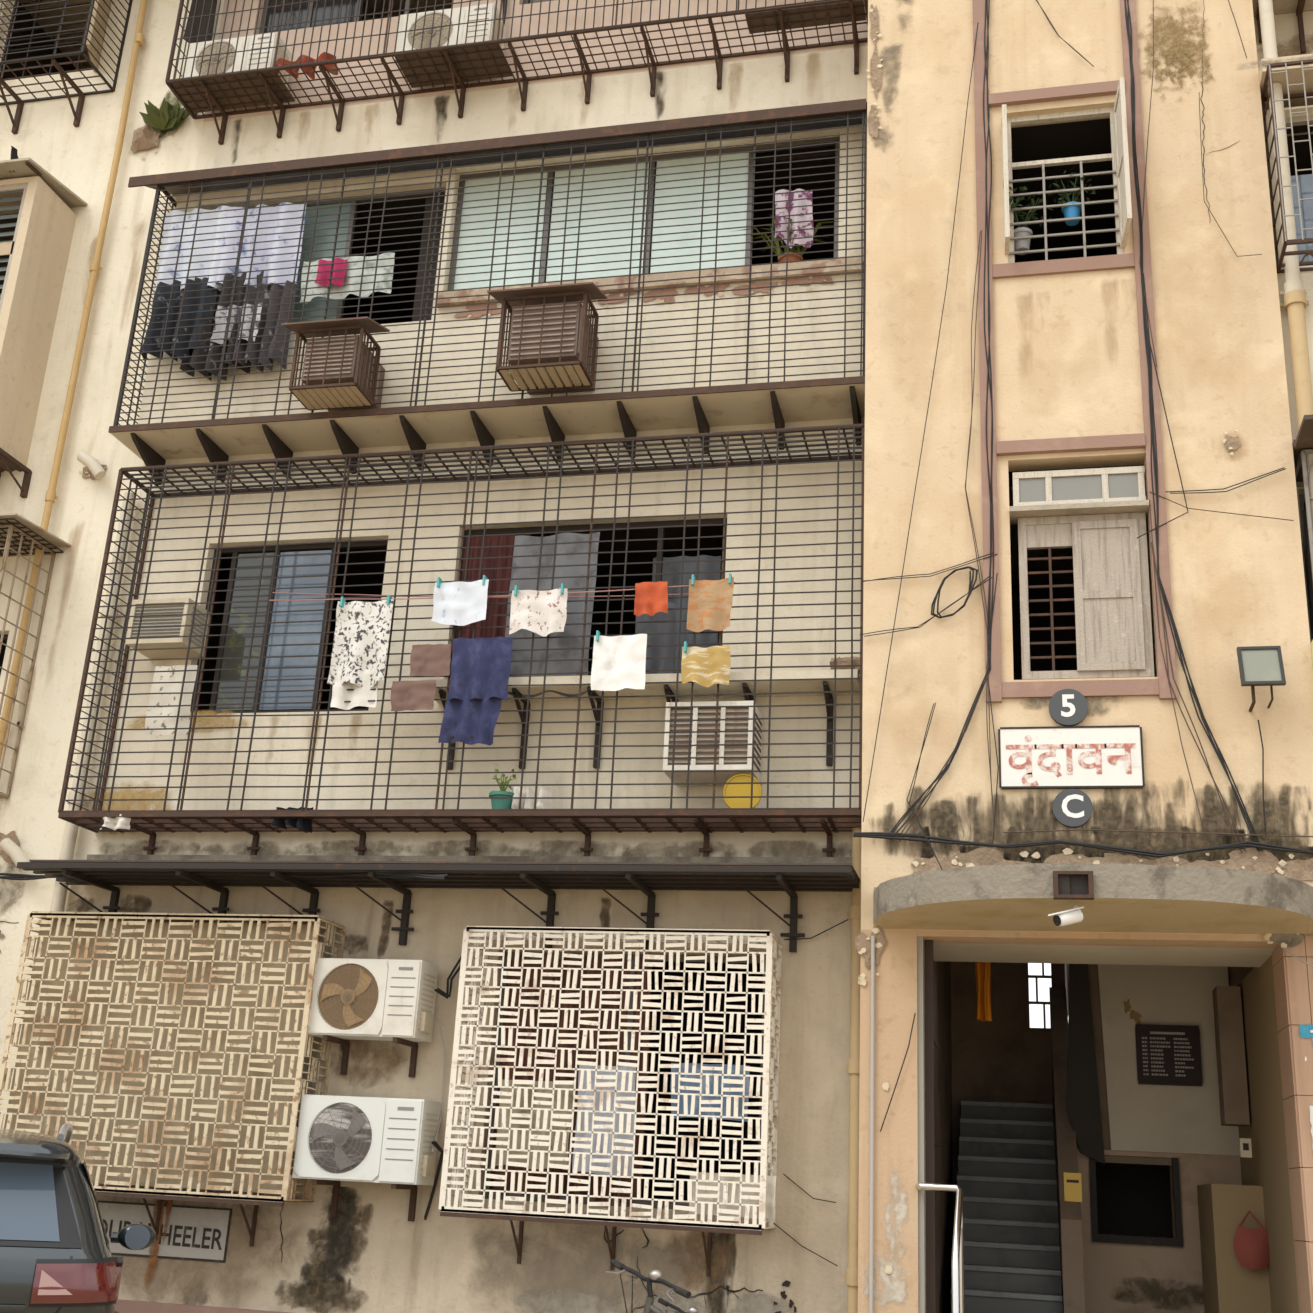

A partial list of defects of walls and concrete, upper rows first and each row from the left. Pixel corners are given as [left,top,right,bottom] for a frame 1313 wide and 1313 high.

water stain [881,46,900,106]
water stain [1143,8,1212,91]
water stain [876,130,888,144]
water stain [879,782,1295,862]
rust [145,1200,173,1284]
water stain [112,1204,289,1305]
water stain [276,1187,372,1313]
water stain [477,1226,736,1313]